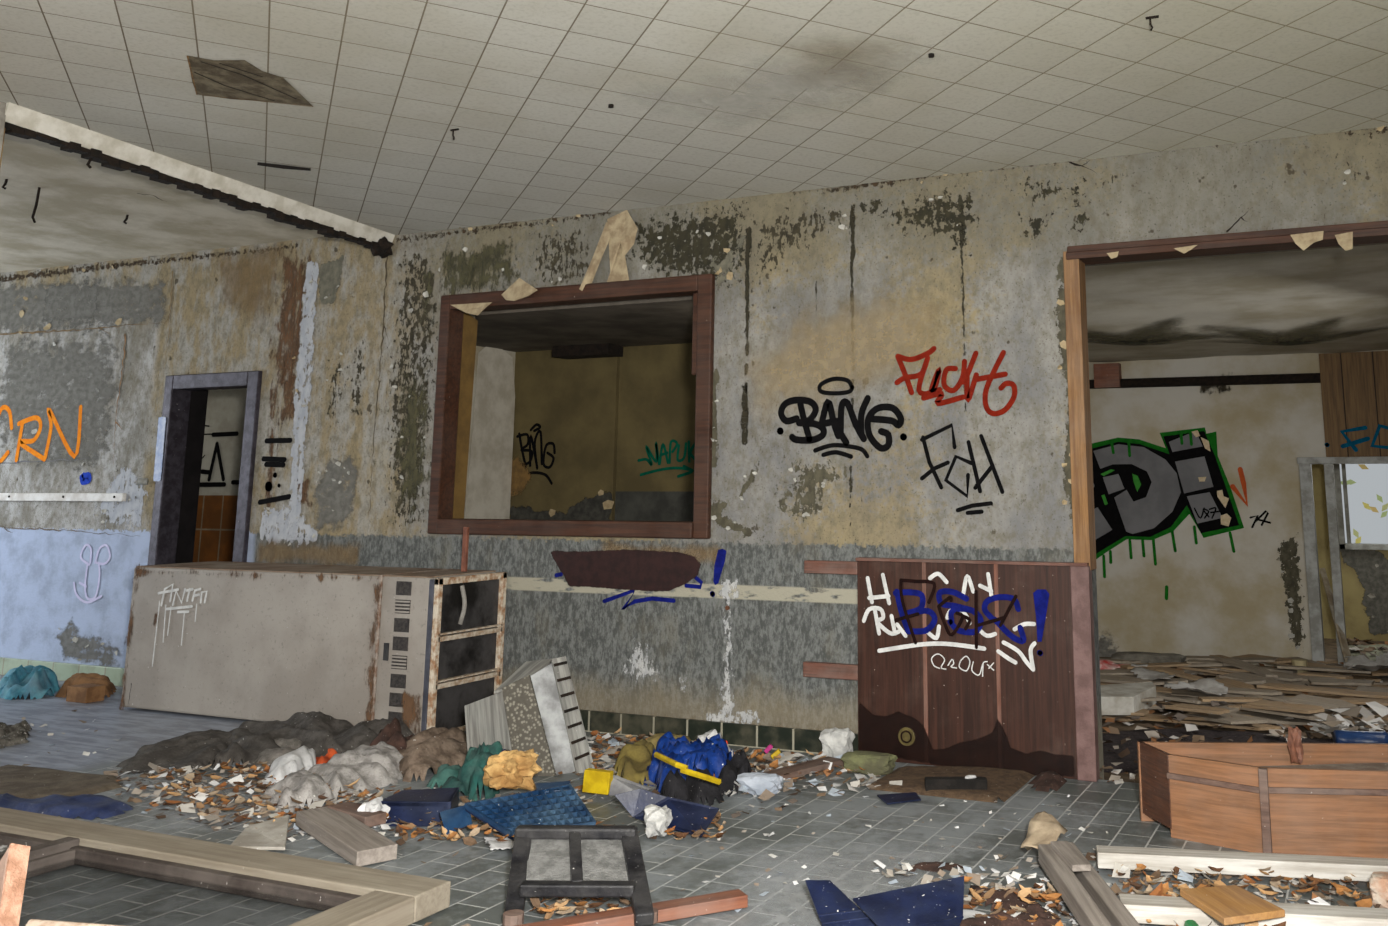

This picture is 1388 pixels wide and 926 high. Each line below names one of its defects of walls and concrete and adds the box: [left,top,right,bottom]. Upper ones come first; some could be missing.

spalling [93,467,148,533]
peeling [0,243,298,470]
peeling [260,260,366,548]
peeling [395,375,431,533]
leakage [1088,320,1382,346]
peeling [1276,532,1306,652]
peeling [1340,549,1388,635]